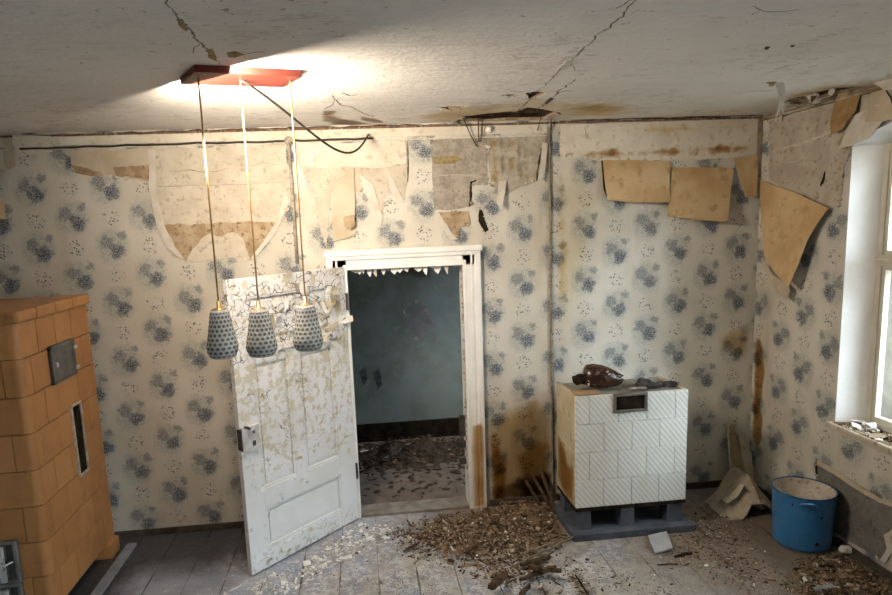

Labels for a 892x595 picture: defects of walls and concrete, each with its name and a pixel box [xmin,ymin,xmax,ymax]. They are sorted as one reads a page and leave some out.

crack [164,0,256,64]
crack [519,0,636,110]
crack [113,93,441,134]
spalling [469,201,489,234]